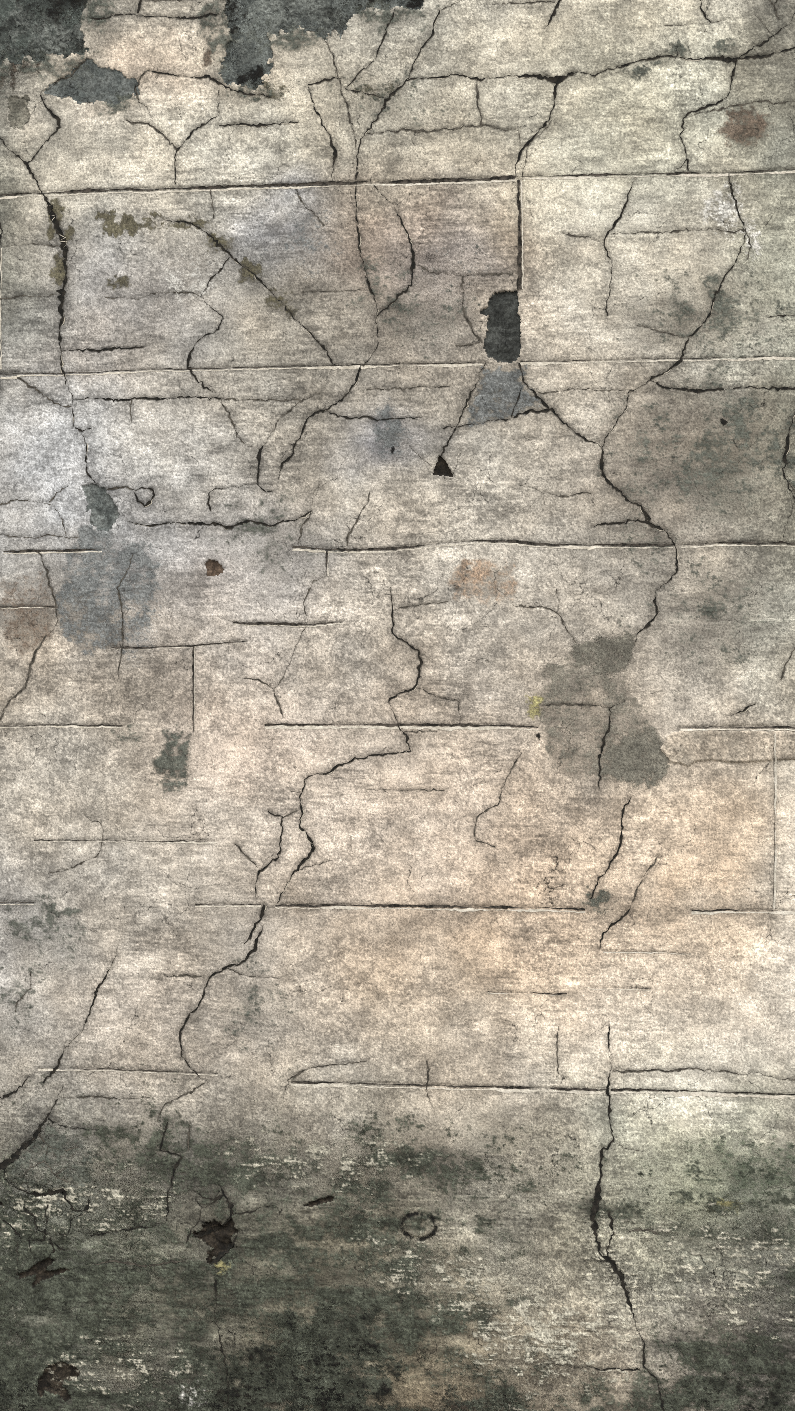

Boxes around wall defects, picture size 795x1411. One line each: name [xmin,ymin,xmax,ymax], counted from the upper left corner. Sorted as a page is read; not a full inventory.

spalling [0,0,140,130]
spalling [218,0,424,90]
crack [0,0,795,720]
peeling [433,456,453,477]
spalling [480,291,521,363]
leakage [622,271,795,574]
crack [545,703,658,947]
leakage [538,626,670,788]
leakage [671,557,771,676]
crack [0,587,461,1411]
leakage [0,1096,795,1411]
crack [540,1025,795,1411]